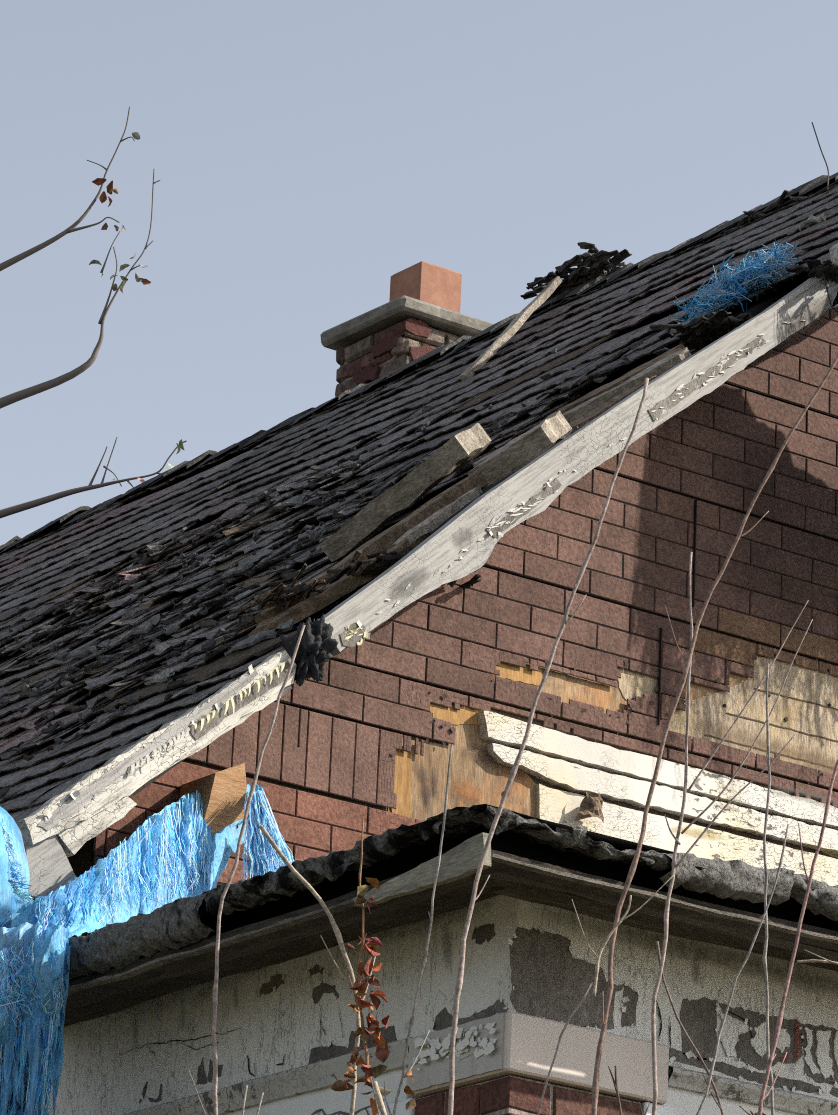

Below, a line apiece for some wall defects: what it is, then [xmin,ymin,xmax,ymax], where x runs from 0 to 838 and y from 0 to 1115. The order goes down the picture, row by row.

peeling [38,658,294,831]
peeling [259,974,285,997]
peeling [306,965,339,1004]
peeling [412,923,642,1071]
peeling [308,1026,397,1064]
peeling [669,996,838,1097]
peeling [193,1058,223,1085]
crack [311,1099,384,1115]